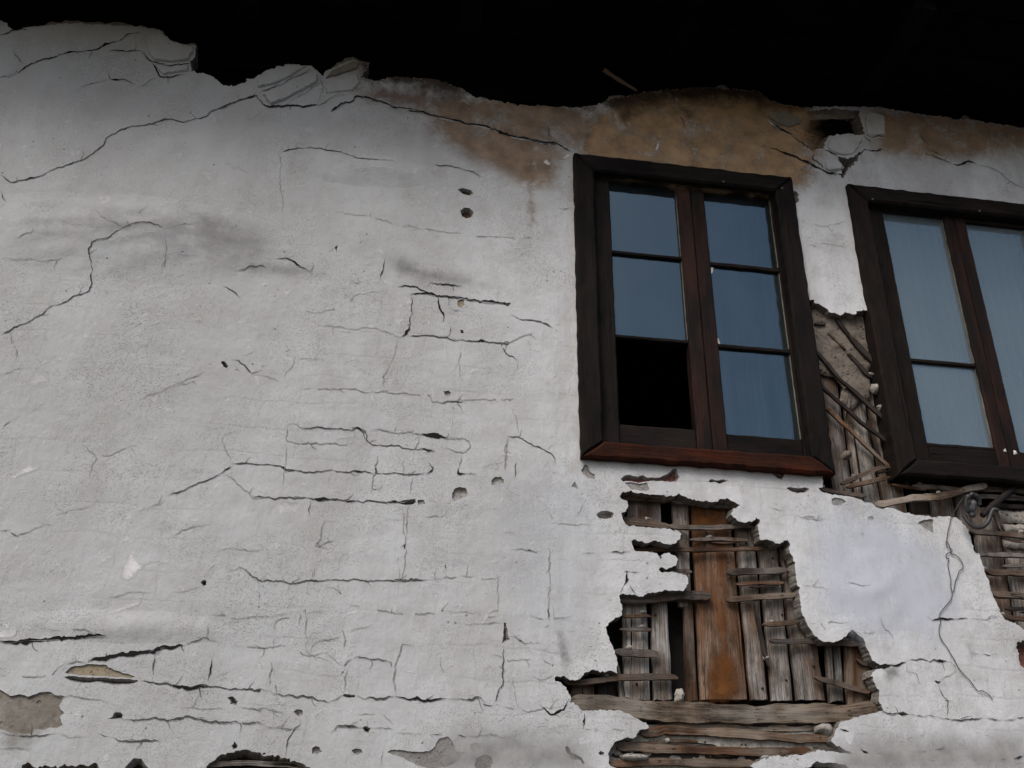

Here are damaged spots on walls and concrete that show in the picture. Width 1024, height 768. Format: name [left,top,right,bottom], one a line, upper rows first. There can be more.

flaking render [144,31,194,75]
crack [0,70,571,212]
water stain [362,62,588,183]
water stain [603,87,774,119]
crack [759,116,839,175]
flaking render [806,113,885,172]
crack [0,207,197,376]
crack [0,256,622,763]
flaking render [811,308,1024,629]
flaking render [563,471,878,768]
crack [928,614,997,622]
peeling [0,691,64,734]